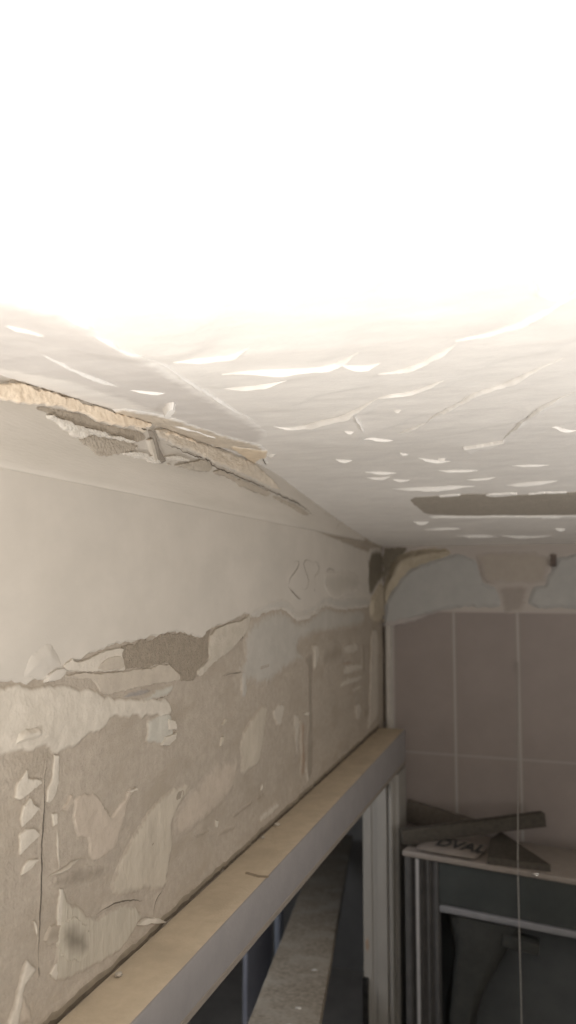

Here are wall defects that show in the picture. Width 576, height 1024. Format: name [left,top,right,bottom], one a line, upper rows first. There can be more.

flaking render [36,407,280,491]
flaking render [411,491,576,520]
peeling [0,614,285,982]
crack [33,626,386,1024]
peeling [6,960,36,1024]